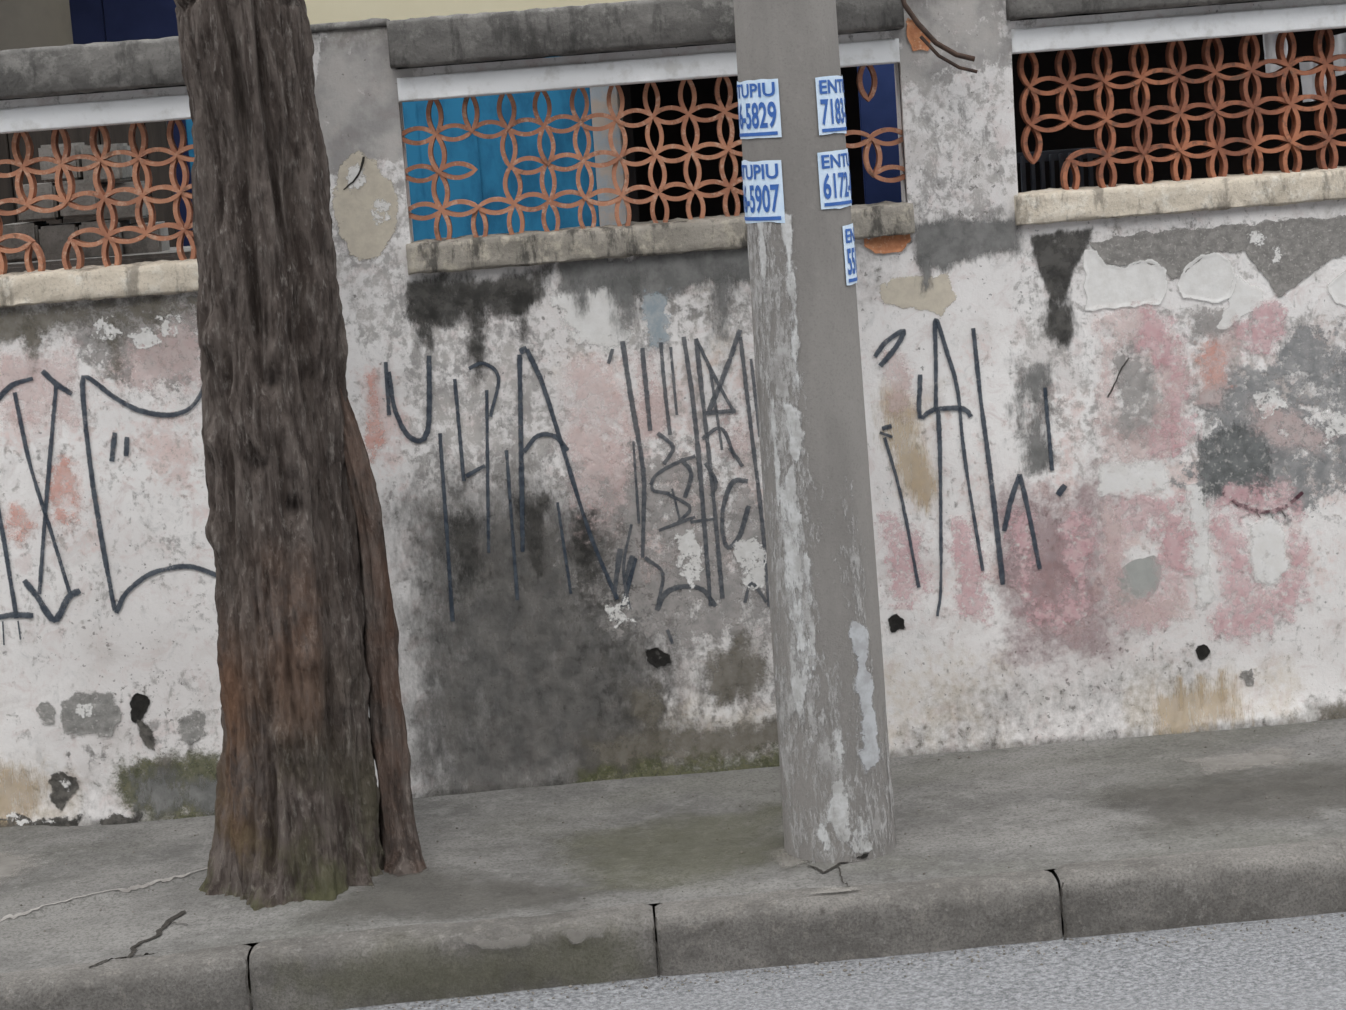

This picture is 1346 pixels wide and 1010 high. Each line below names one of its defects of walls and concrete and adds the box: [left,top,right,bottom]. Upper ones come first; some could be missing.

peeling [332,151,399,261]
peeling [880,273,957,316]
spalling [1083,215,1346,343]
peeling [1093,321,1346,608]
peeling [550,214,897,864]
spalling [888,614,905,633]
spalling [36,692,155,751]
spalling [0,771,83,827]
spalling [100,811,143,825]
damp [129,754,217,818]